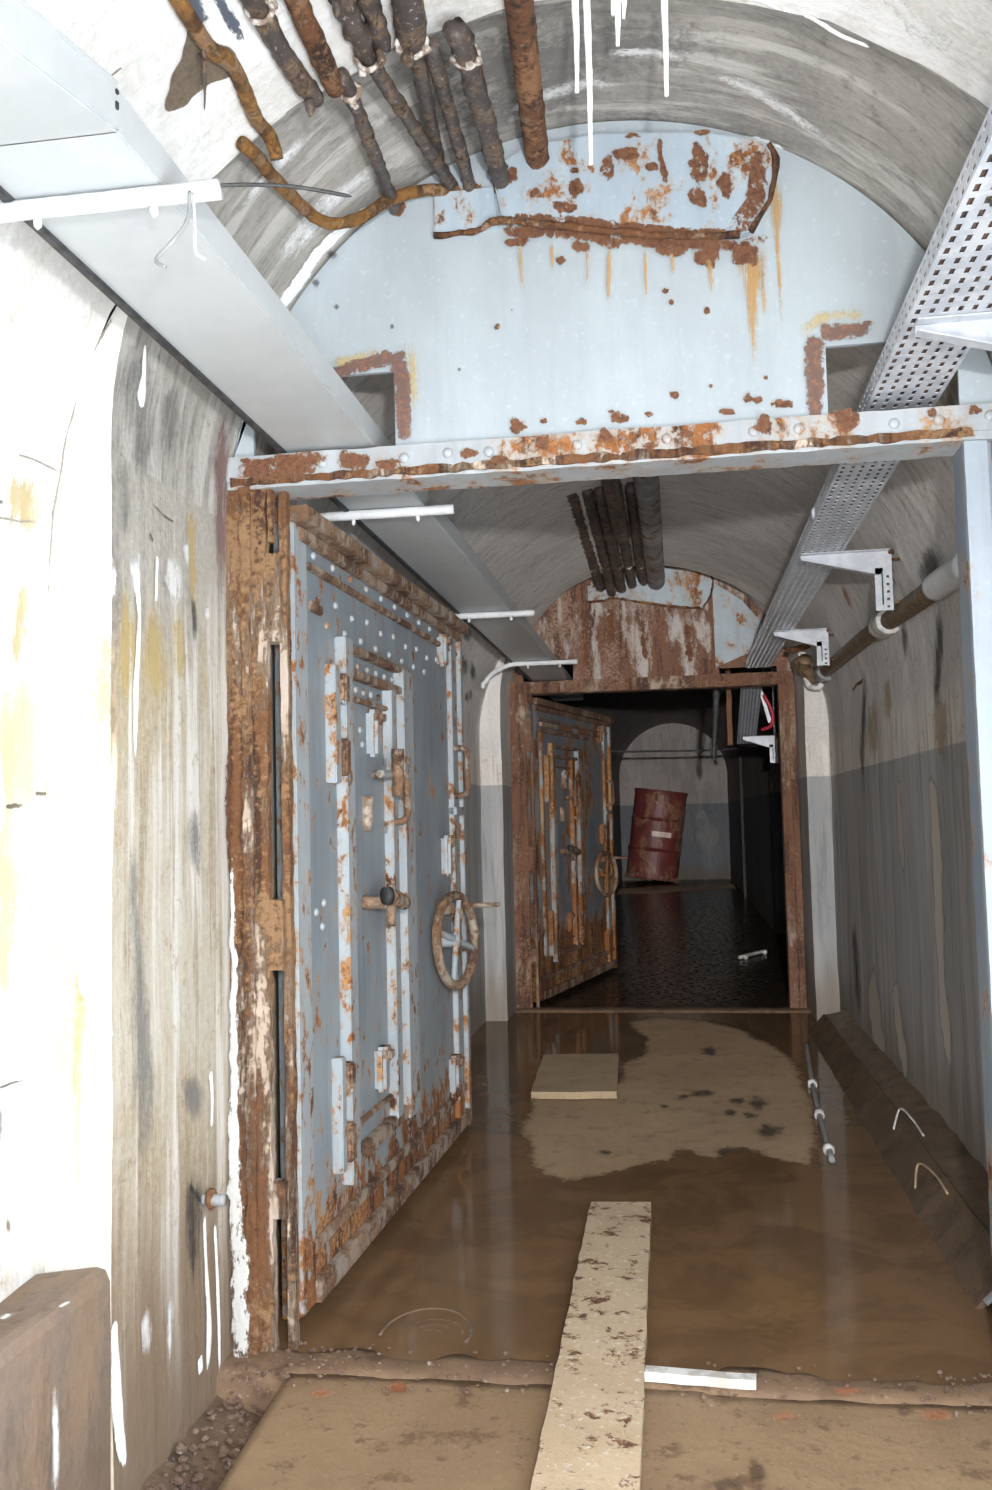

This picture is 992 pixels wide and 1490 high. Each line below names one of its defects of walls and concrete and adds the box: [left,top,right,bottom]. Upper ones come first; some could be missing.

rust [451,167,518,193]
rust [504,129,781,347]
leakage [126,344,177,464]
rust [214,312,982,589]
leakage [11,480,36,529]
rust [580,609,615,666]
rust [640,620,648,659]
rust [684,624,693,662]
rust [512,679,781,694]
leakage [0,517,209,1259]